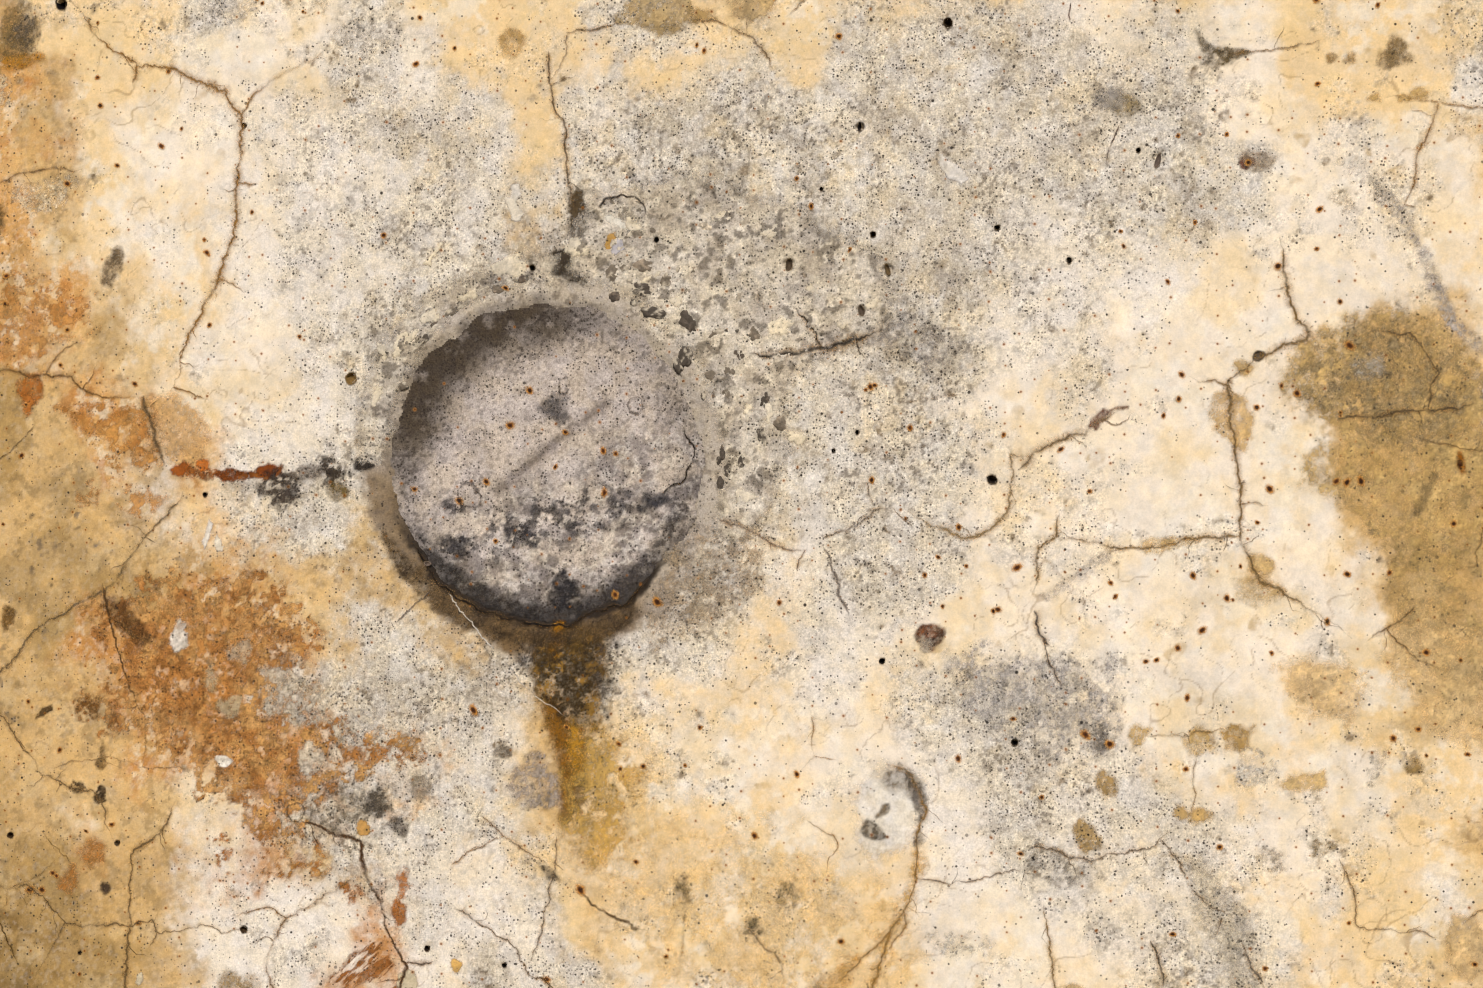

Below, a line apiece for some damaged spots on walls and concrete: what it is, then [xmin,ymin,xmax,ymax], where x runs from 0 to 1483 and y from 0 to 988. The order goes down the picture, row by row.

crack [3,18,260,459]
rust [117,484,162,515]
rust [0,270,283,482]
spalling [356,172,889,543]
crack [1034,249,1333,683]
leakage [1282,307,1483,747]
rust [73,567,427,902]
rust [530,621,657,868]
crack [841,766,1263,988]